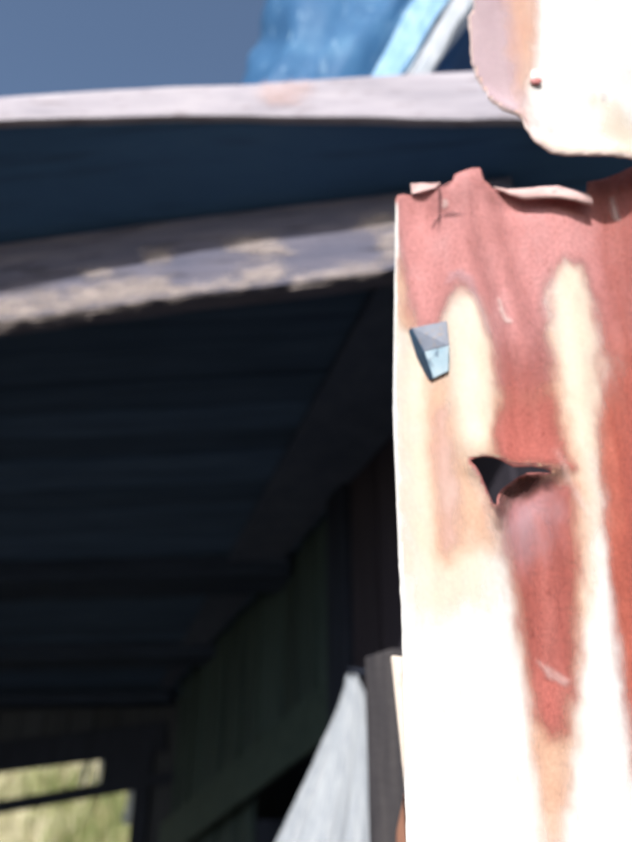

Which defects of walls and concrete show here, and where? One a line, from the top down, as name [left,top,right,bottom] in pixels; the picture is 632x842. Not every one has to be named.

rust [470,0,535,120]
crack [432,181,461,227]
rust [397,167,632,842]